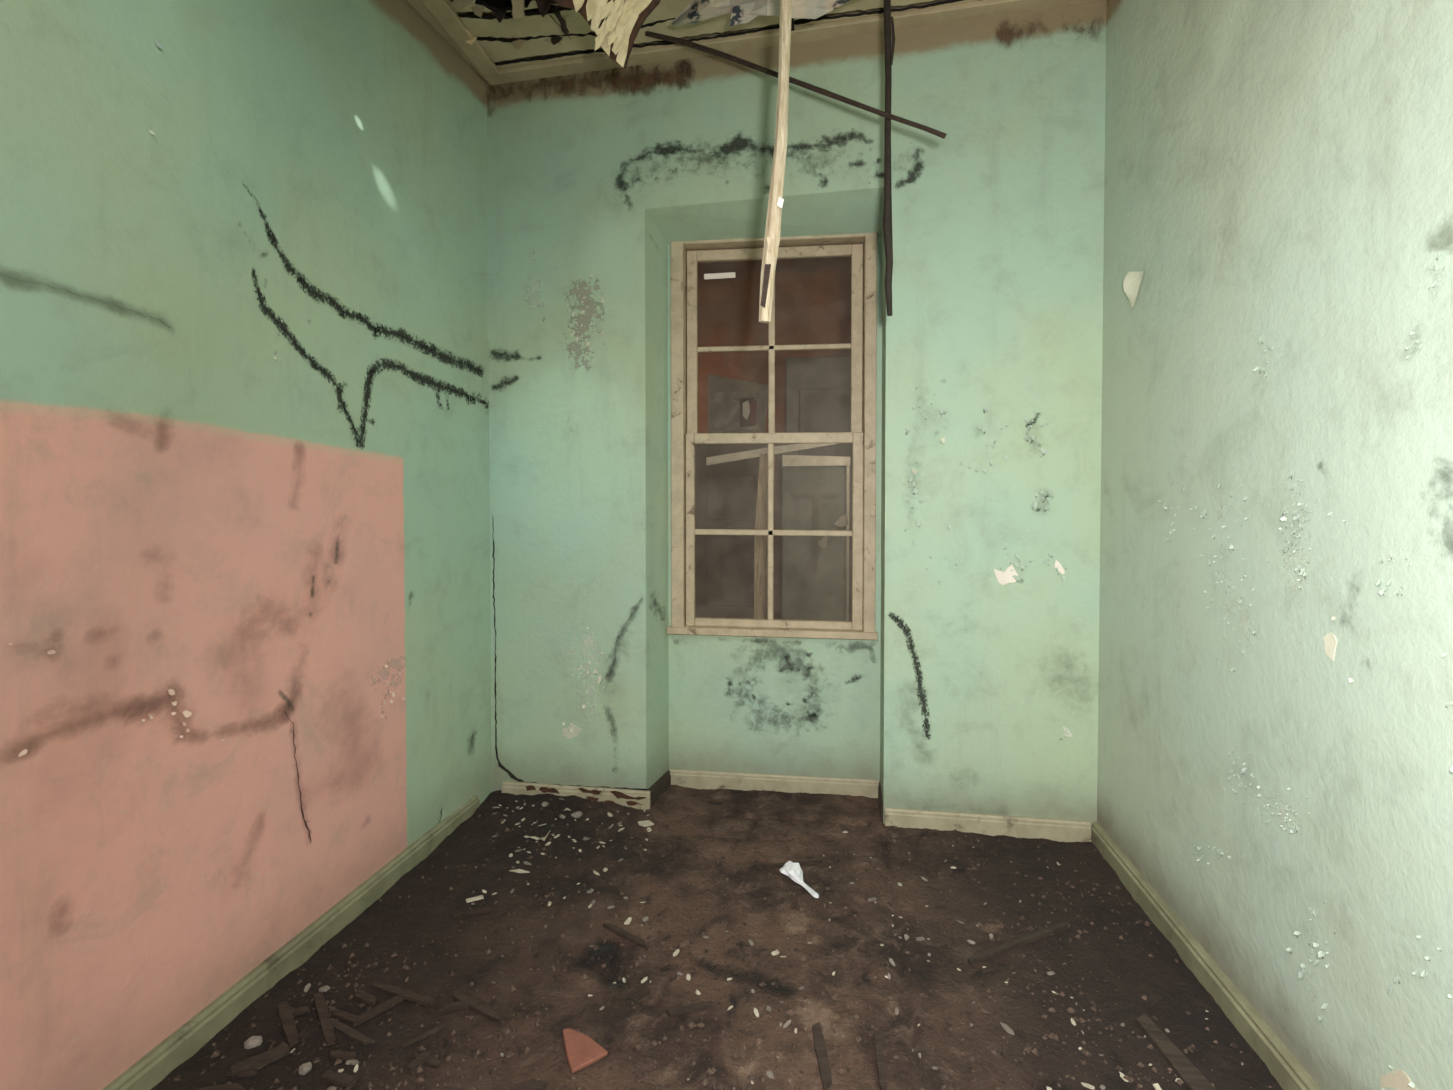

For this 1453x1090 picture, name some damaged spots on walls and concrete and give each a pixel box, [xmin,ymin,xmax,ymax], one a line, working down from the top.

leakage [617,132,870,205]
leakage [853,149,923,186]
crack [246,187,489,448]
peeling [565,274,605,370]
peeling [1158,473,1346,672]
crack [492,515,649,791]
leakage [766,648,817,720]
crack [889,613,931,740]
crack [281,694,311,843]
spalling [1380,1065,1418,1090]